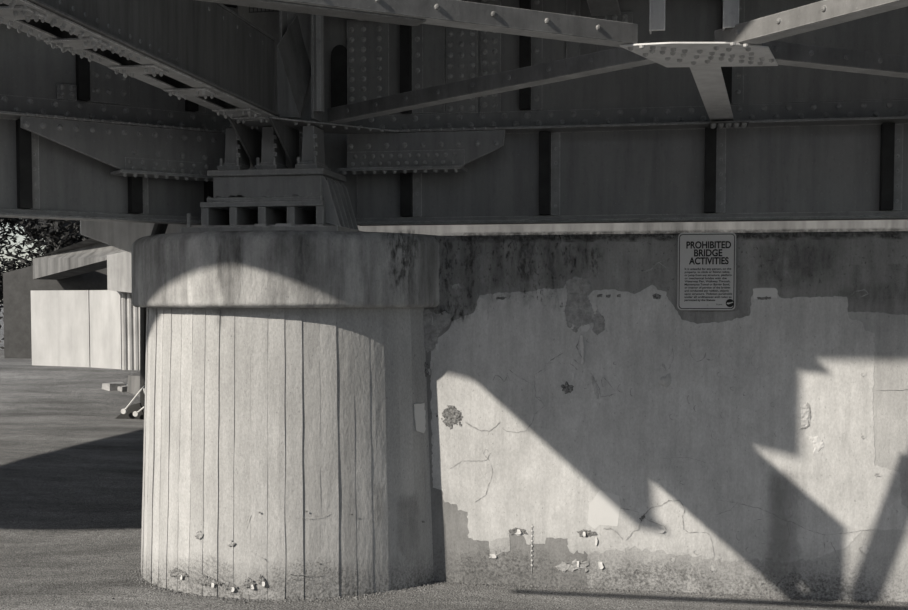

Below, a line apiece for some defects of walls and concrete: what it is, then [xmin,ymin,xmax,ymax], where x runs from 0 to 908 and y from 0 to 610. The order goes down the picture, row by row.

peeling [564,276,621,364]
spalling [561,373,574,394]
spalling [436,405,463,430]
crack [451,335,616,502]
peeling [800,403,824,454]
peeling [576,529,597,546]
crack [603,500,873,562]
peeling [555,559,604,573]
spalling [169,567,266,592]